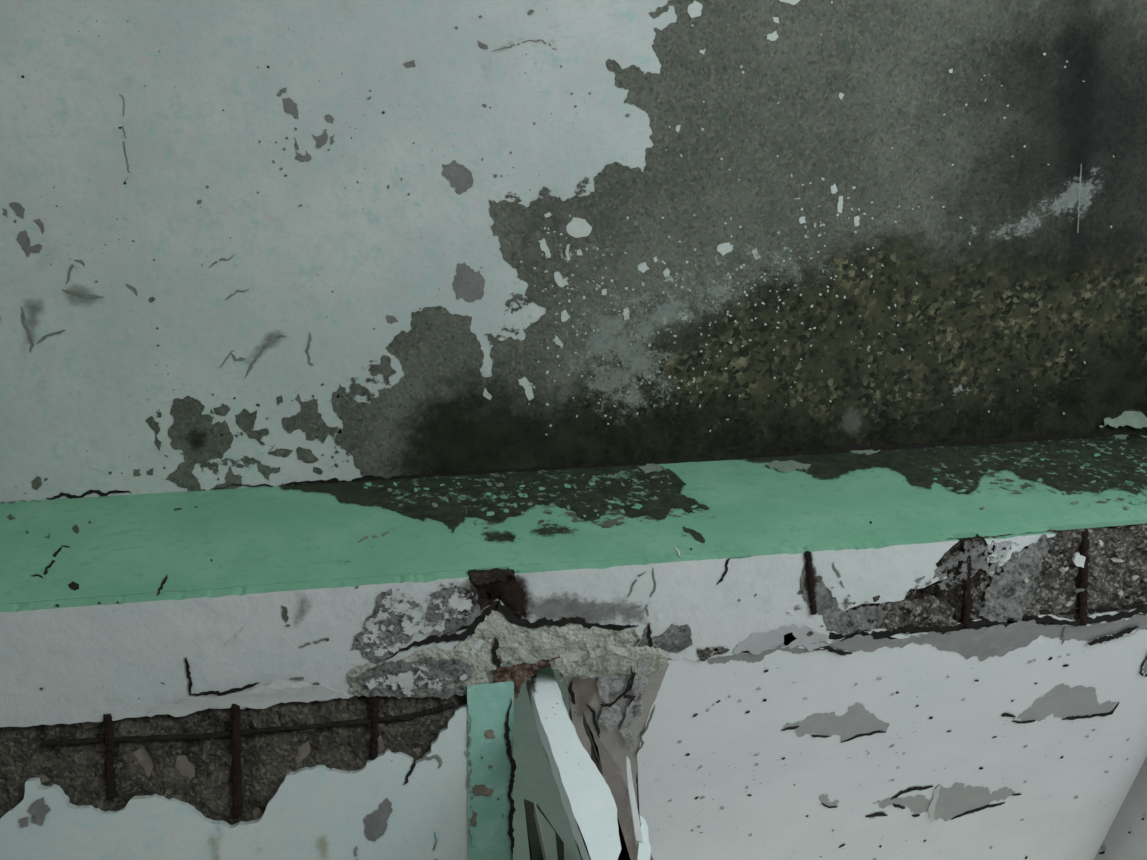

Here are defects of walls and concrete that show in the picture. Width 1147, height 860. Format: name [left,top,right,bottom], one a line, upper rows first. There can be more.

damp [990,28,1147,279]
peeling [3,202,45,257]
peeling [133,0,1147,491]
damp [279,244,1147,544]
peeling [31,476,48,490]
corrosion [462,575,531,620]
corrosion [905,534,1050,627]
spalling [0,523,1147,827]
crack [568,682,600,738]
crack [635,705,655,758]